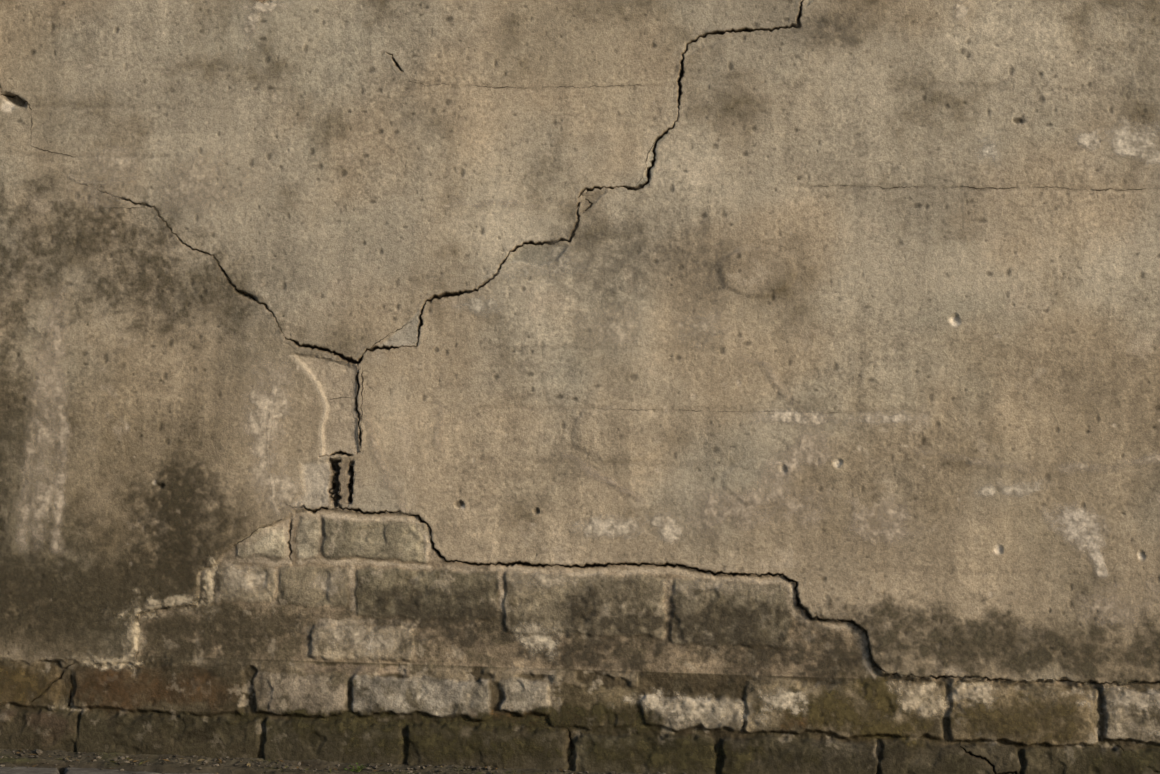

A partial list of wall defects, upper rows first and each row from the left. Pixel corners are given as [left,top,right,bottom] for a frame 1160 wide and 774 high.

crack [960,184,1143,192]
water stain [0,148,267,676]
water stain [246,367,299,513]
crack [0,0,1013,687]
spalling [136,351,885,685]
spalling [992,543,1005,556]
water stain [625,690,748,723]
water stain [330,567,1160,717]
crack [1052,674,1160,691]